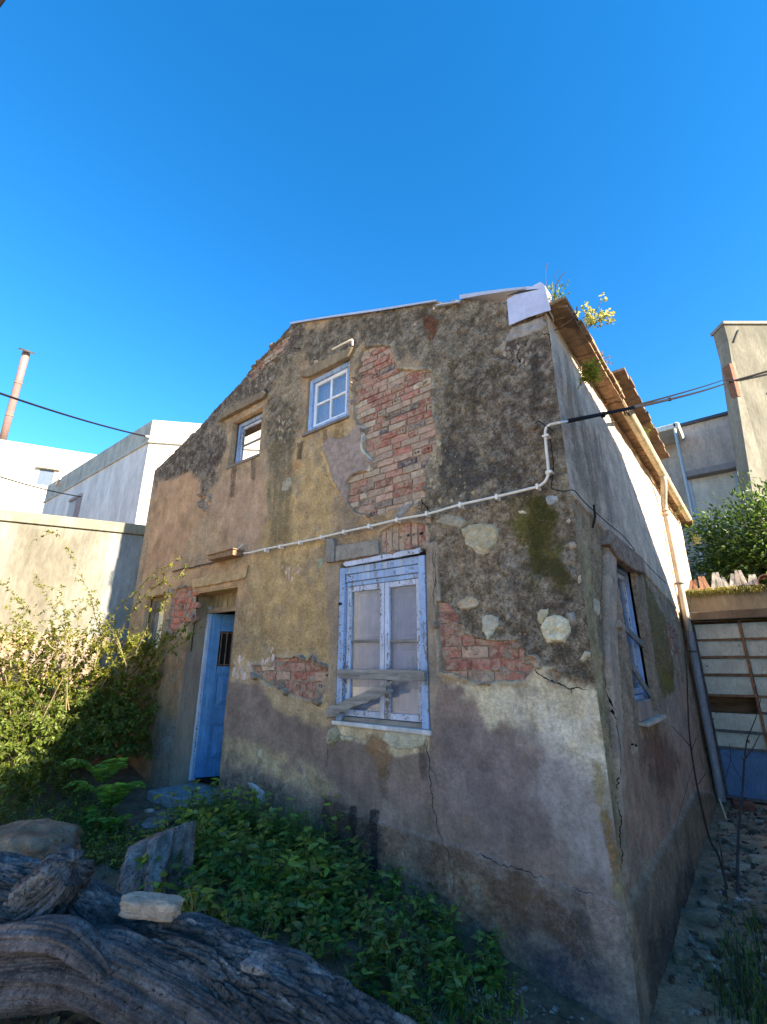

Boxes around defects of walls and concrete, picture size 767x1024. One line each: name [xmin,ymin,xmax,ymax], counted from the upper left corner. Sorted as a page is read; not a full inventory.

flaking render [348,347,475,518]
flaking render [381,517,431,555]
flaking render [164,585,201,634]
flaking render [232,646,328,707]
flaking render [431,603,565,686]
crack [534,561,624,872]
crack [426,741,454,889]
crack [476,853,545,879]